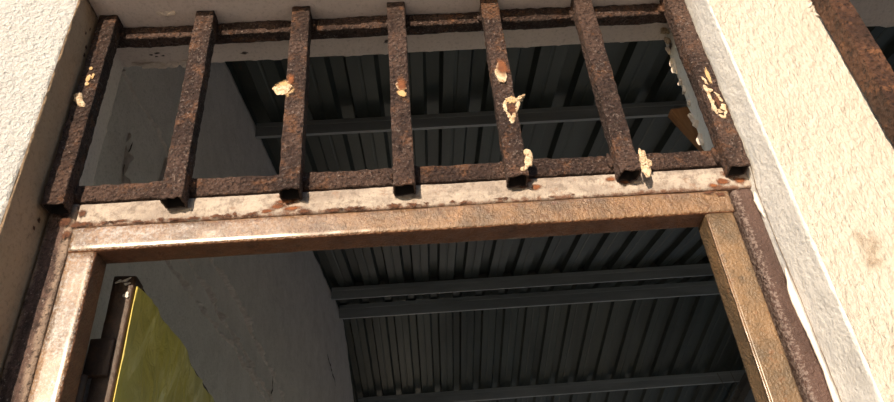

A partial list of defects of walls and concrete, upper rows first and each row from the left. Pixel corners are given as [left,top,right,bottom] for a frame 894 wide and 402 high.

rust [704,171,745,196]
rust [156,197,311,221]
rust [57,210,145,239]